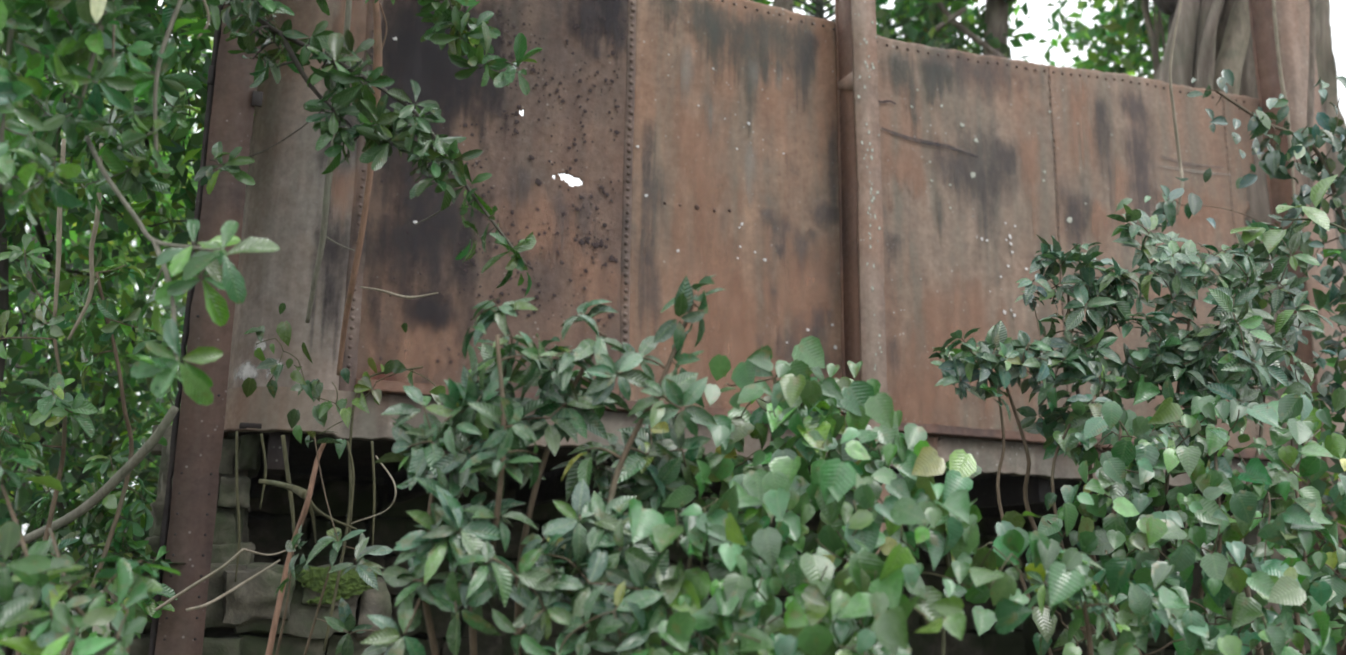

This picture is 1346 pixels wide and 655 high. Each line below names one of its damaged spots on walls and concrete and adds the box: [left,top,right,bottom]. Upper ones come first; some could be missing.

spalling [412,0,626,327]
rust [398,322,438,382]